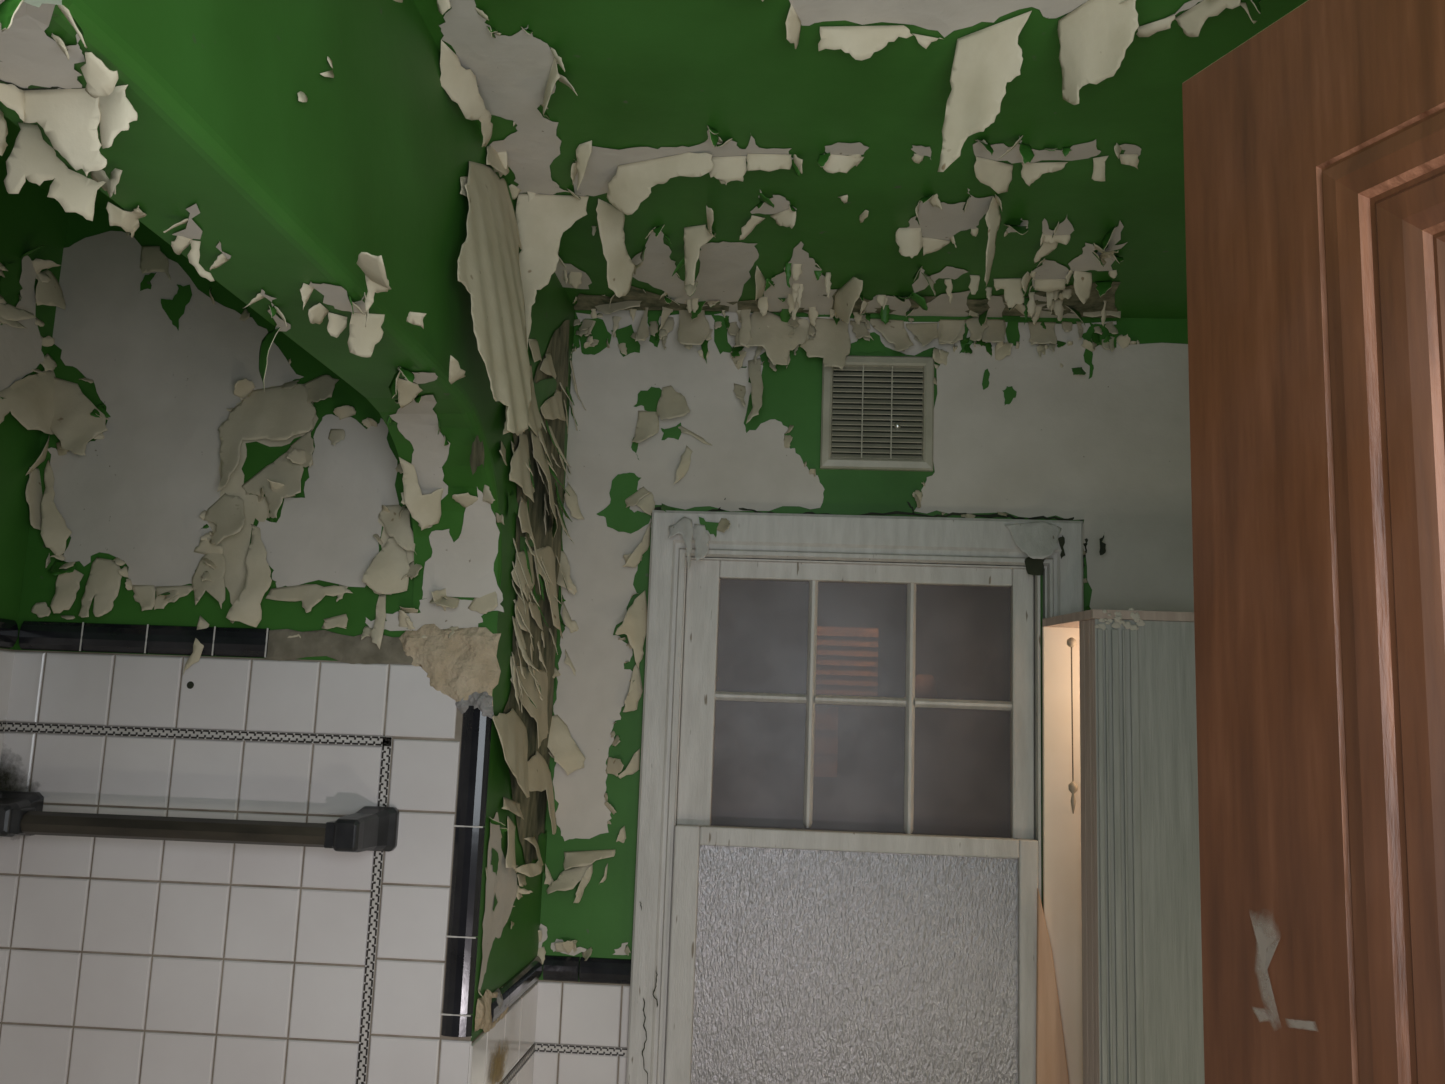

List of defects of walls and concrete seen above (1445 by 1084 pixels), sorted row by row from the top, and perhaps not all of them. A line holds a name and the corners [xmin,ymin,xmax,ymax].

peeling [0,0,1194,1033]